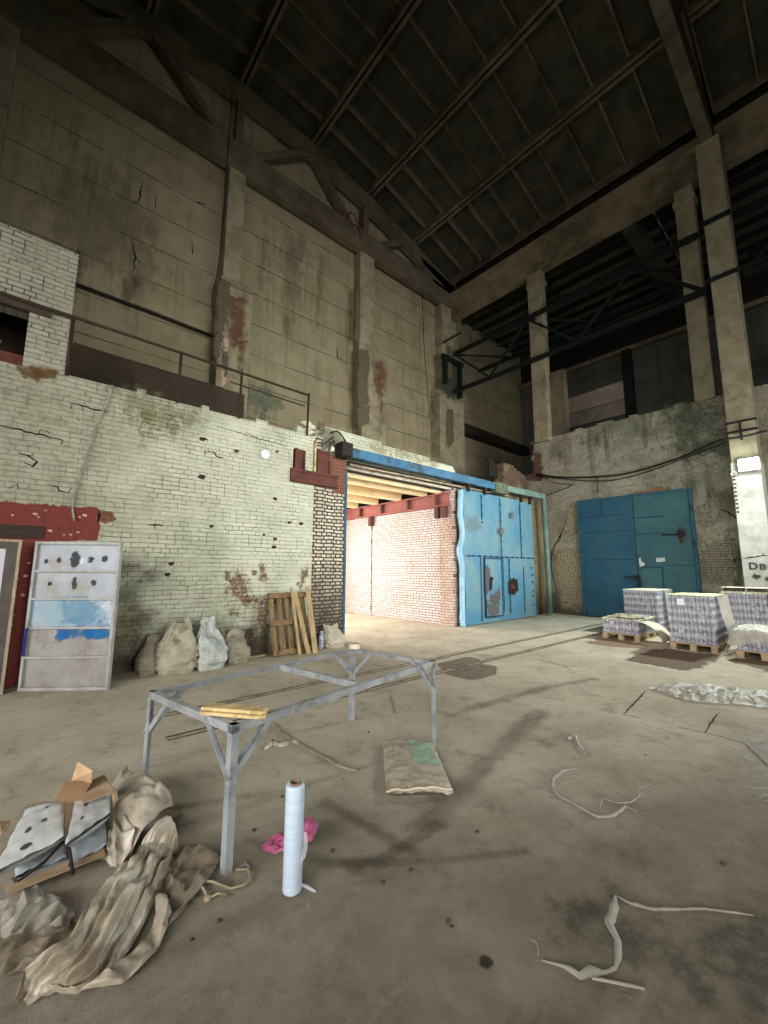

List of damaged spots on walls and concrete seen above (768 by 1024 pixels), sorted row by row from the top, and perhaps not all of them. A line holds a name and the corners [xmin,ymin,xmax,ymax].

crack [130,239,141,272]
spalling [213,279,231,387]
corrosion [16,365,59,381]
crack [0,403,110,493]
peeling [0,500,116,689]
flaking render [225,564,276,632]
corrosion [485,565,515,616]
crack [623,691,646,719]
crack [678,713,743,743]